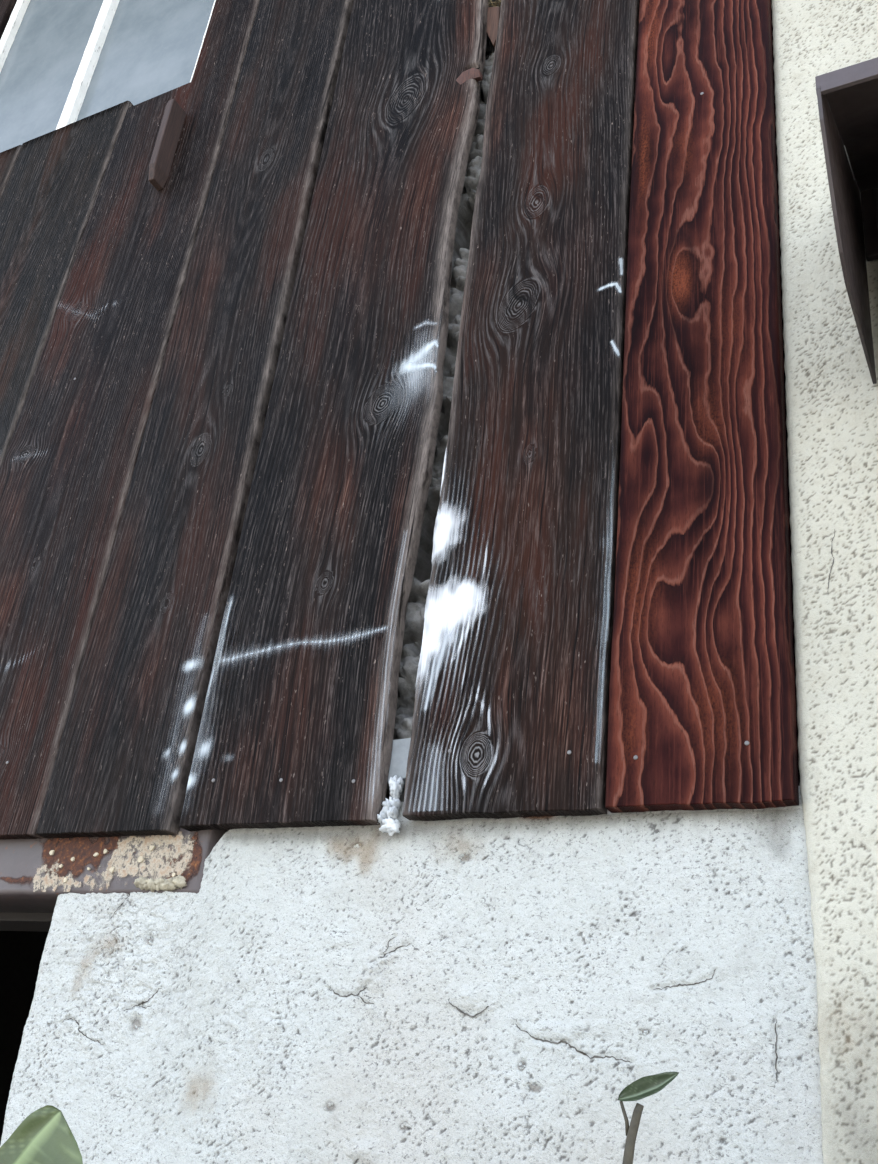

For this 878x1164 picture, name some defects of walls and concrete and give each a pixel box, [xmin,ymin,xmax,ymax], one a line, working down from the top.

corrosion [0,876,32,884]
corrosion [42,836,119,880]
peeling [33,831,194,892]
corrosion [165,832,202,882]
crack [330,988,374,1004]
crack [654,970,715,990]